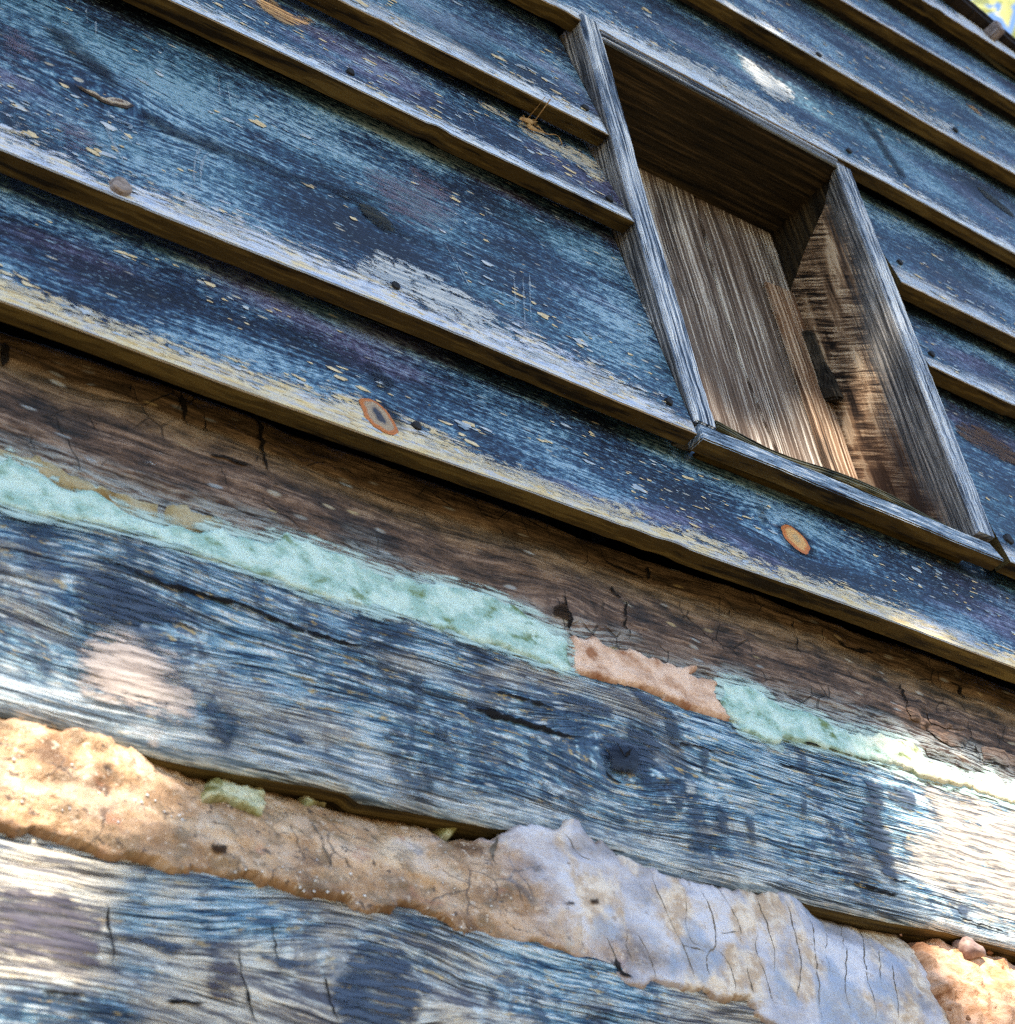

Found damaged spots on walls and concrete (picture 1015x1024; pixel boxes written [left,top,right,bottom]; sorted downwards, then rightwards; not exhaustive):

peeling [0,74,694,431]
peeling [895,249,1015,337]
crack [180,394,279,485]
peeling [0,264,1015,667]
crack [490,834,498,862]
crack [854,878,911,896]
crack [582,934,656,977]
crack [652,875,899,1016]